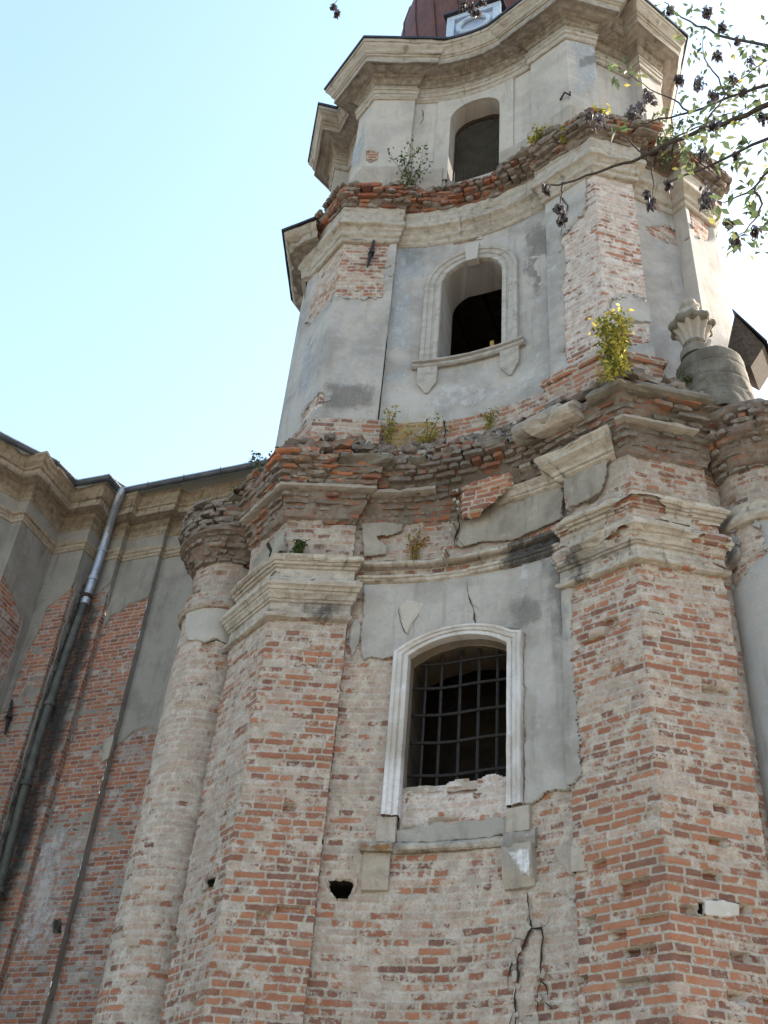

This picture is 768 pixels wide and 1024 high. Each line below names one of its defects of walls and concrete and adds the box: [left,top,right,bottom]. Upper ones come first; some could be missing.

flaking render [305,244,393,326]
flaking render [558,175,710,363]
flaking render [460,472,516,519]
flaking render [729,520,768,587]
flaking render [0,575,157,1024]
hole [325,877,359,902]
crack [507,892,553,1024]